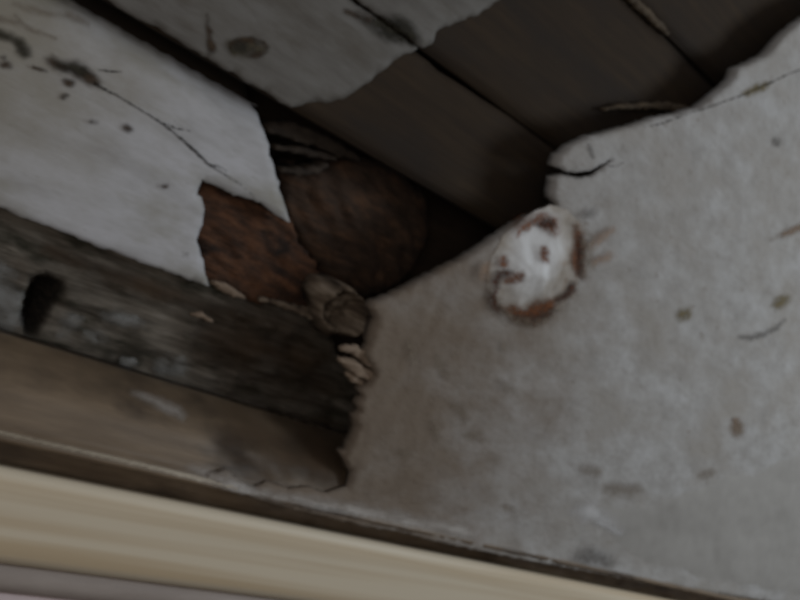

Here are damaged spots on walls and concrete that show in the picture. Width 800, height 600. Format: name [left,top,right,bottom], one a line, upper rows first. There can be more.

crack [93,70,238,183]
crack [559,149,613,177]
spalling [196,181,320,311]
rust [517,213,558,237]
rust [481,226,614,326]
spalling [336,343,374,385]